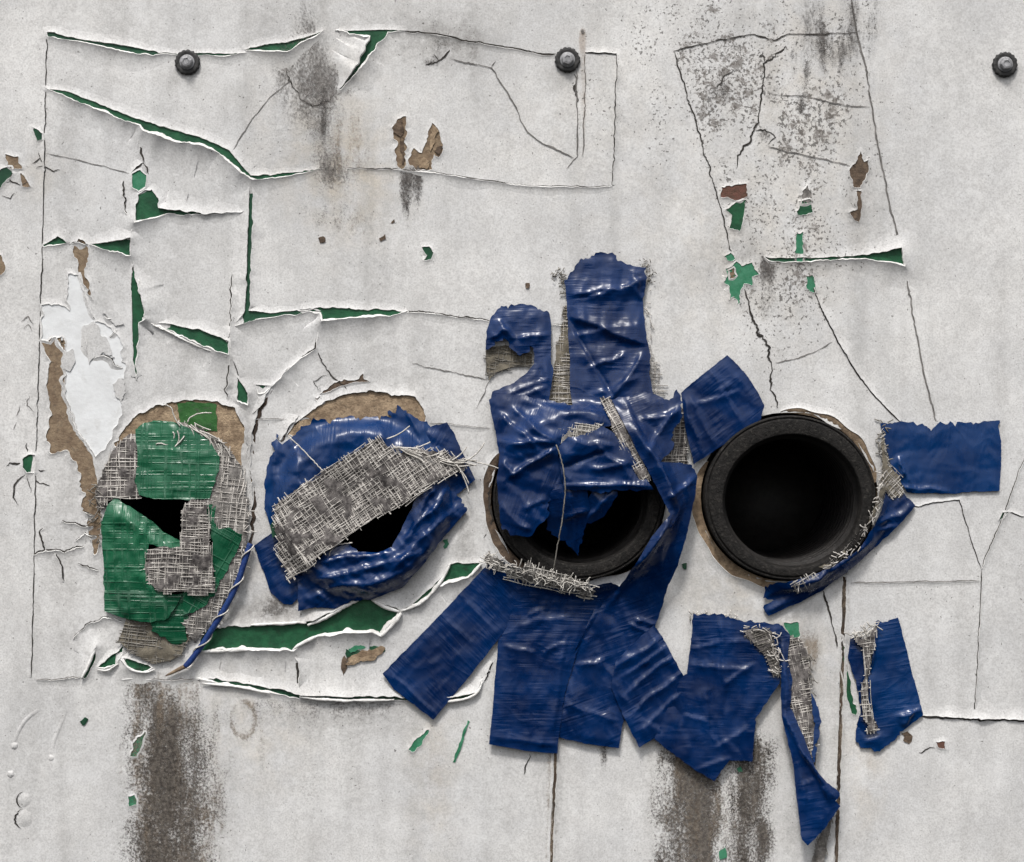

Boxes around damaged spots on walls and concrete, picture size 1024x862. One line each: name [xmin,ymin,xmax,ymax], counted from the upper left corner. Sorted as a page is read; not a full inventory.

peeling [41,24,409,97]
leakage [278,11,348,187]
crack [347,31,628,196]
crack [674,0,901,250]
leakage [792,6,875,81]
peeling [16,83,409,561]
peeling [716,179,930,310]
crack [744,287,903,422]
peeling [187,450,524,708]
crack [851,460,1024,722]
leakage [123,678,225,862]
leakage [651,737,777,862]